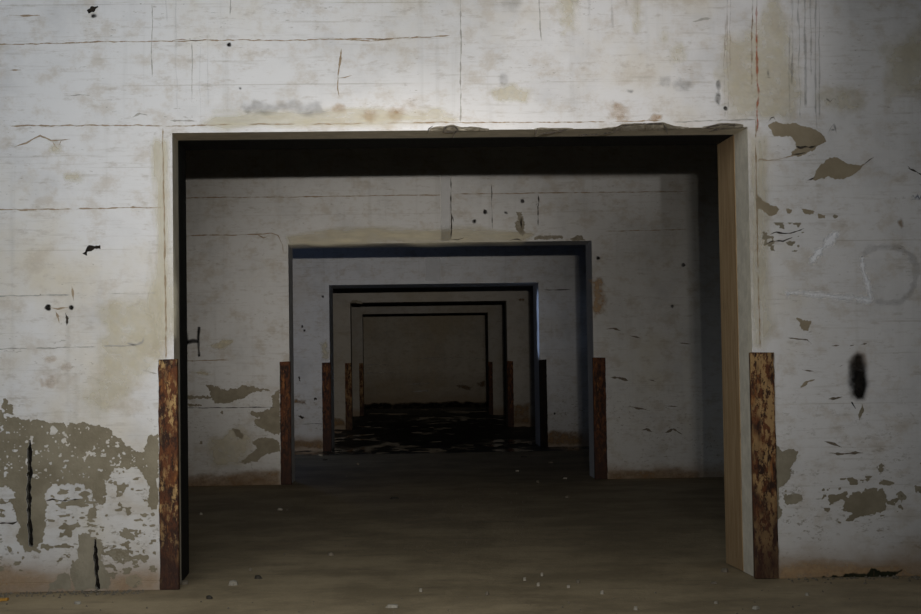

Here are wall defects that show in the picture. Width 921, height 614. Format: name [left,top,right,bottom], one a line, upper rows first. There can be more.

peeling [768,121,826,157]
peeling [812,157,865,181]
peeling [755,195,838,252]
peeling [188,385,280,464]
peeling [0,398,159,591]
peeling [776,445,803,519]
peeling [822,463,921,524]